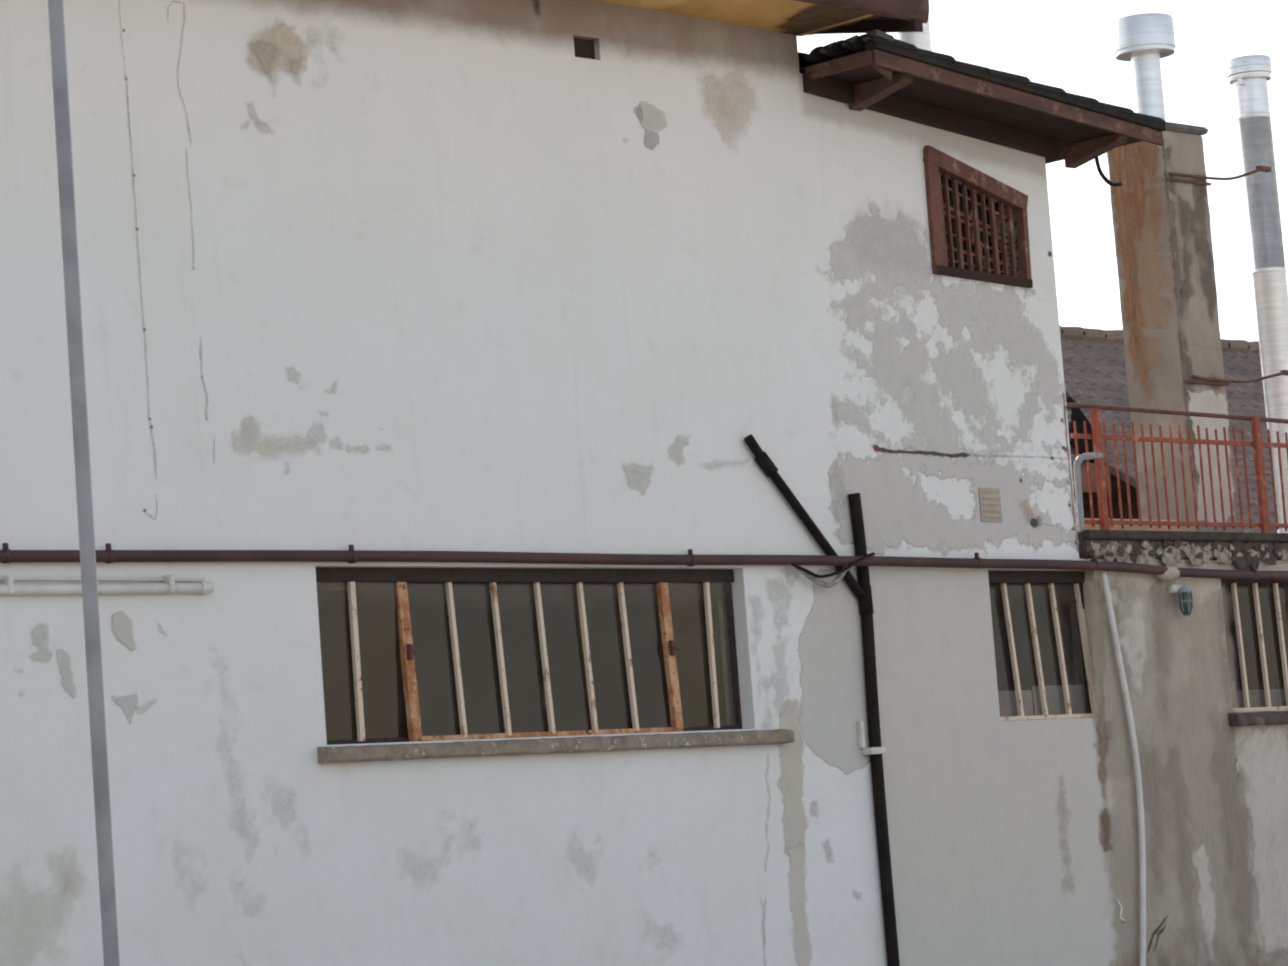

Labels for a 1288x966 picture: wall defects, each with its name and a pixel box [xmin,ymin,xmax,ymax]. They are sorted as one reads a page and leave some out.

water stain [249,23,305,82]
spalling [635,102,667,150]
rust [1107,141,1167,386]
peeling [826,204,1288,581]
peeling [32,626,77,698]
peeling [112,611,136,650]
peeling [112,694,138,723]
water stain [778,701,811,966]
peeling [798,568,870,774]
water stain [1087,581,1256,966]